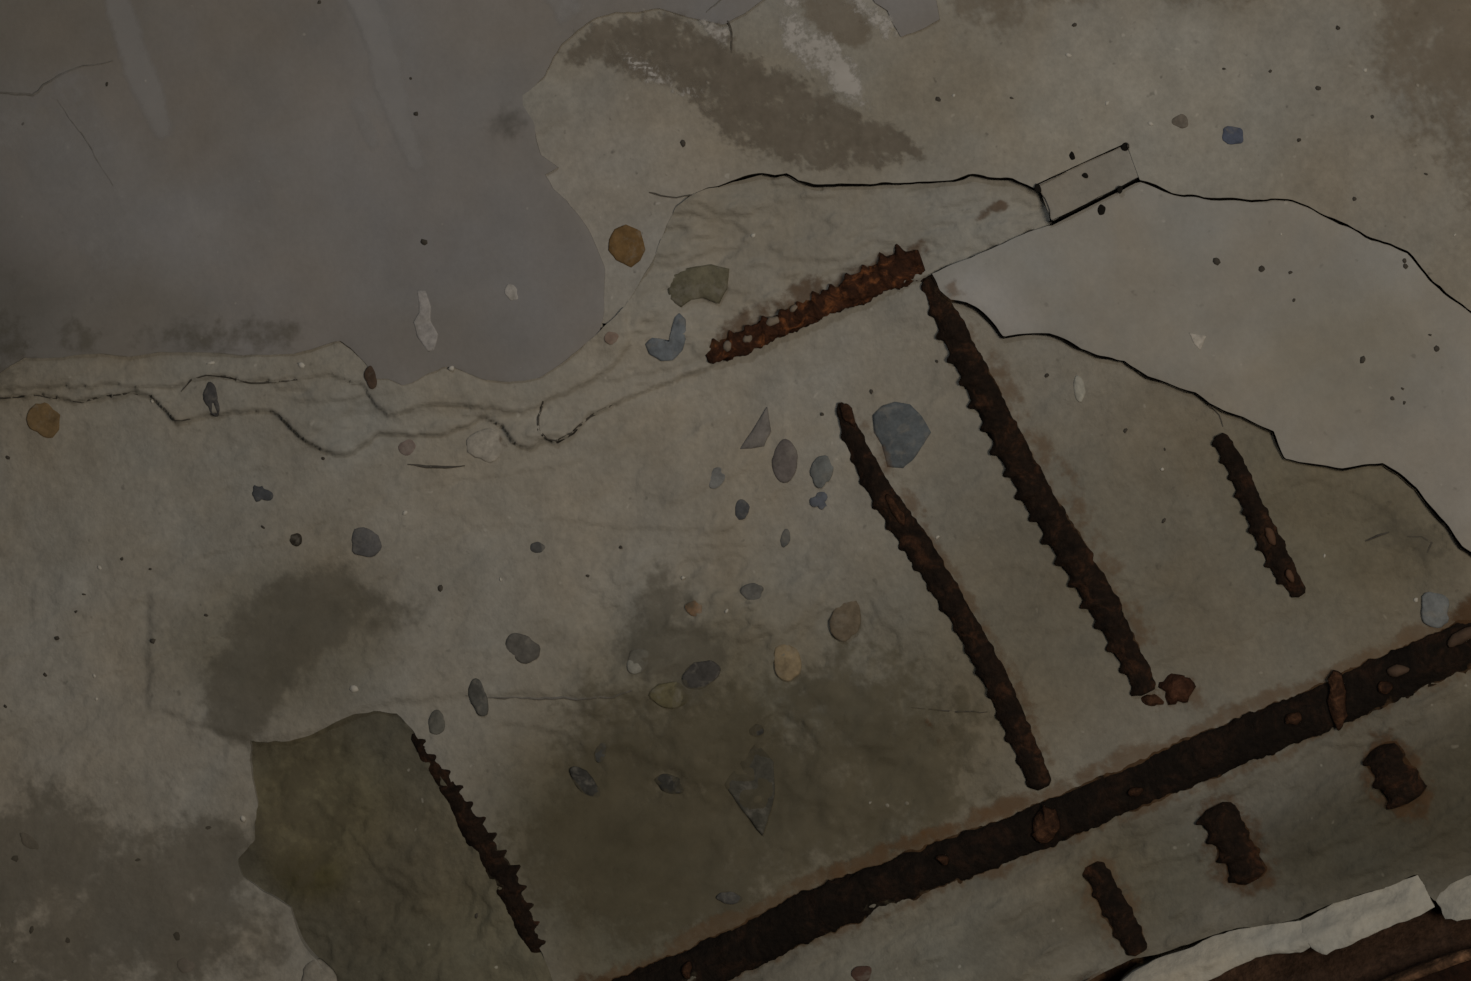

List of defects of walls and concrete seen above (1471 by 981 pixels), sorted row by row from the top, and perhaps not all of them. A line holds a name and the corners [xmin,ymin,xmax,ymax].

crack [0,60,113,185]
damp [566,0,922,170]
peeling [523,0,1471,328]
peeling [413,290,438,352]
spalling [239,711,553,981]
spalling [730,669,1471,981]
corrosion [1380,948,1471,981]